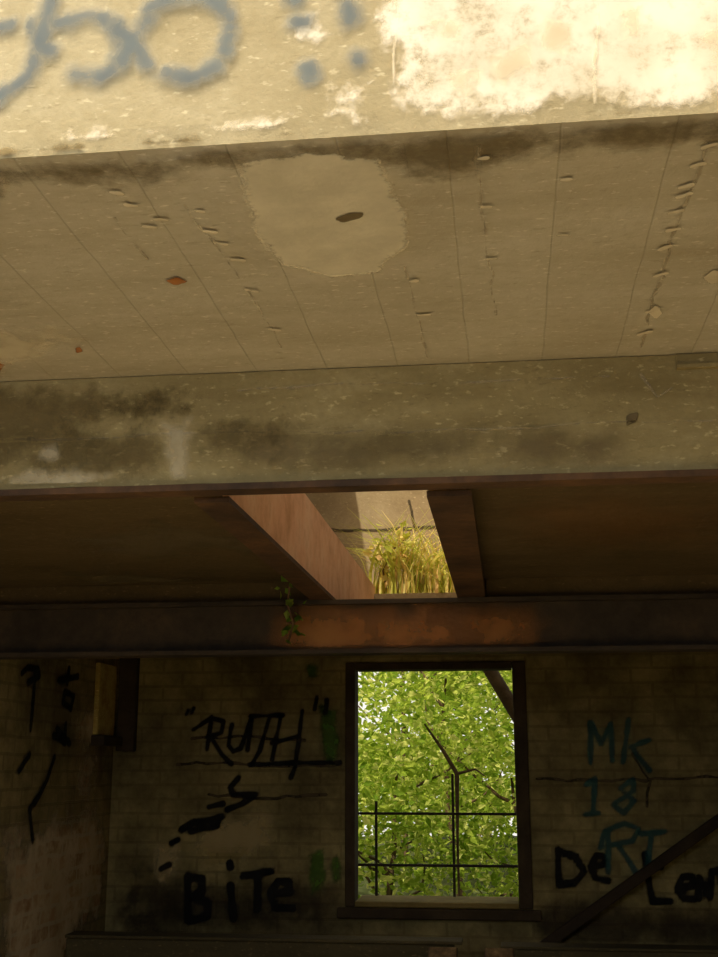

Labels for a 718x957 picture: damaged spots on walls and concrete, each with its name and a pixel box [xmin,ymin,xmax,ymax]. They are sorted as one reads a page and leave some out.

peeling [297,15,324,40]
peeling [375,0,718,116]
spalling [43,130,106,150]
water stain [344,134,533,171]
water stain [596,123,718,145]
crack [636,143,718,347]
water stain [0,391,151,471]
rust [283,603,530,648]